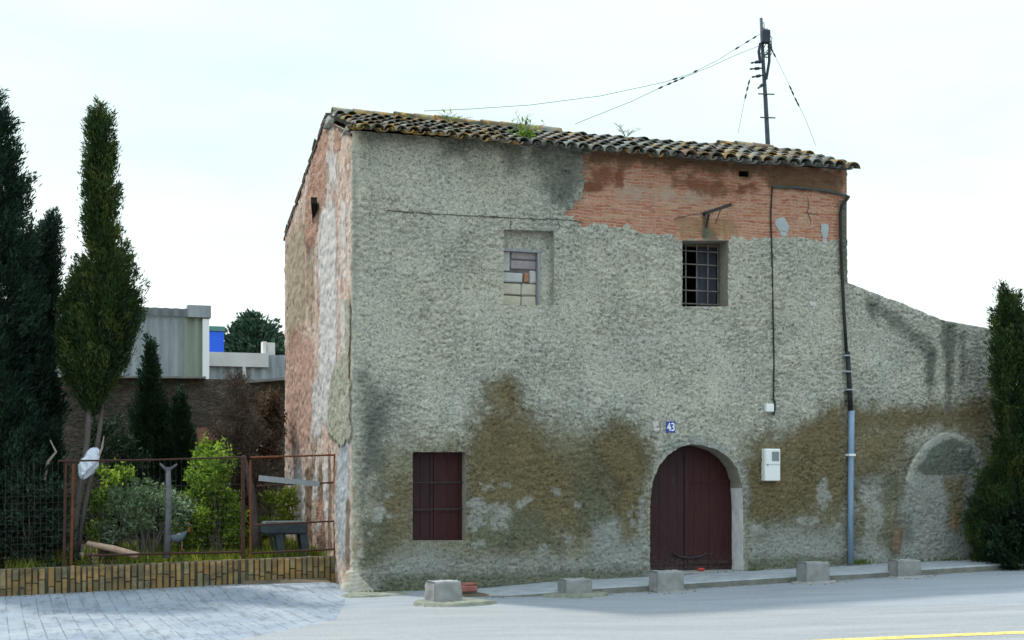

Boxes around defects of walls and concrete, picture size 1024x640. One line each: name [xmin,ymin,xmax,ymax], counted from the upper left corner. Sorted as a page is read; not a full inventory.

flaking render [565,151,846,243]
flaking render [285,129,357,549]
damp [869,301,964,383]
damp [366,383,647,591]
damp [749,392,996,570]